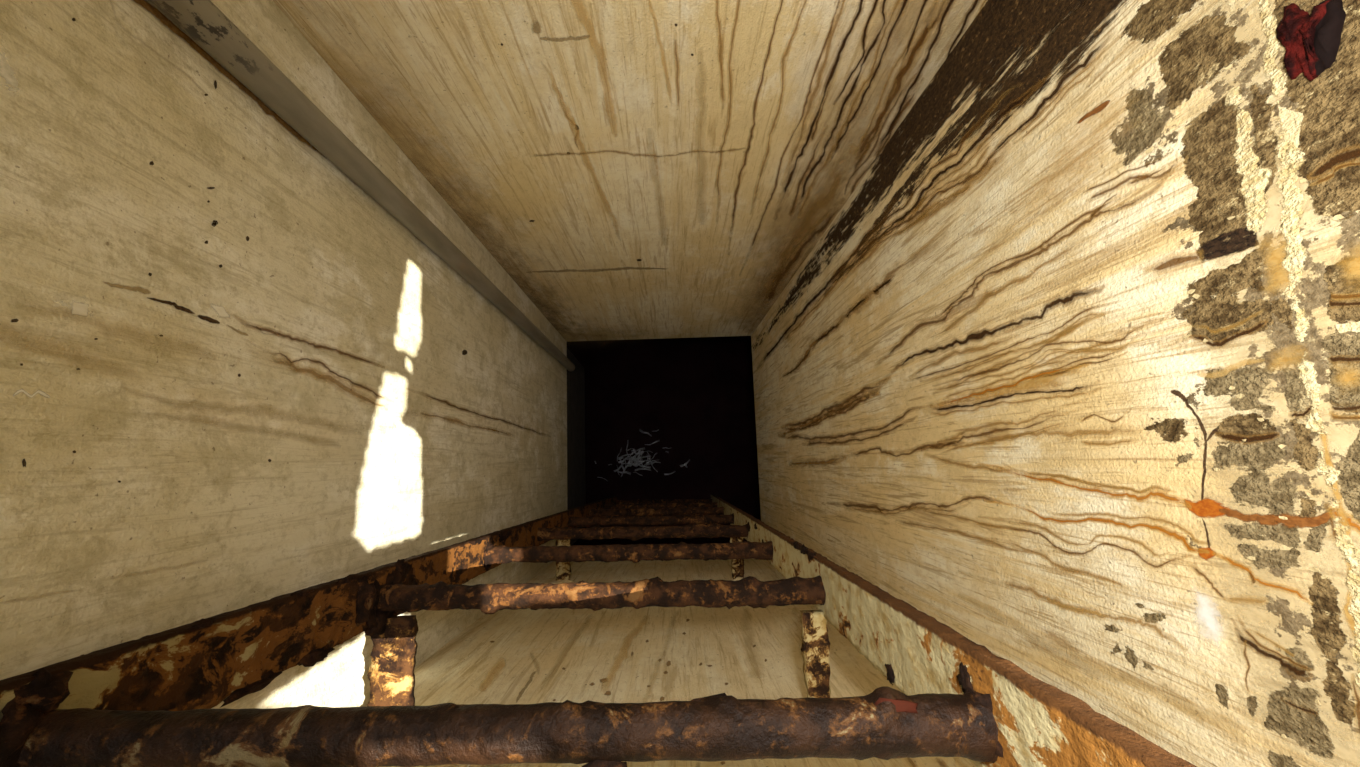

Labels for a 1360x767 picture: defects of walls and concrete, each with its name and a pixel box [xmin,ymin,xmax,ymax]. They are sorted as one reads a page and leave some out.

leakage [716,0,1125,376]
crack [72,282,275,336]
peeling [1105,0,1360,767]
rust [1017,434,1360,541]
crack [1171,390,1218,548]
rust [1028,510,1305,603]
rust [1344,591,1358,637]